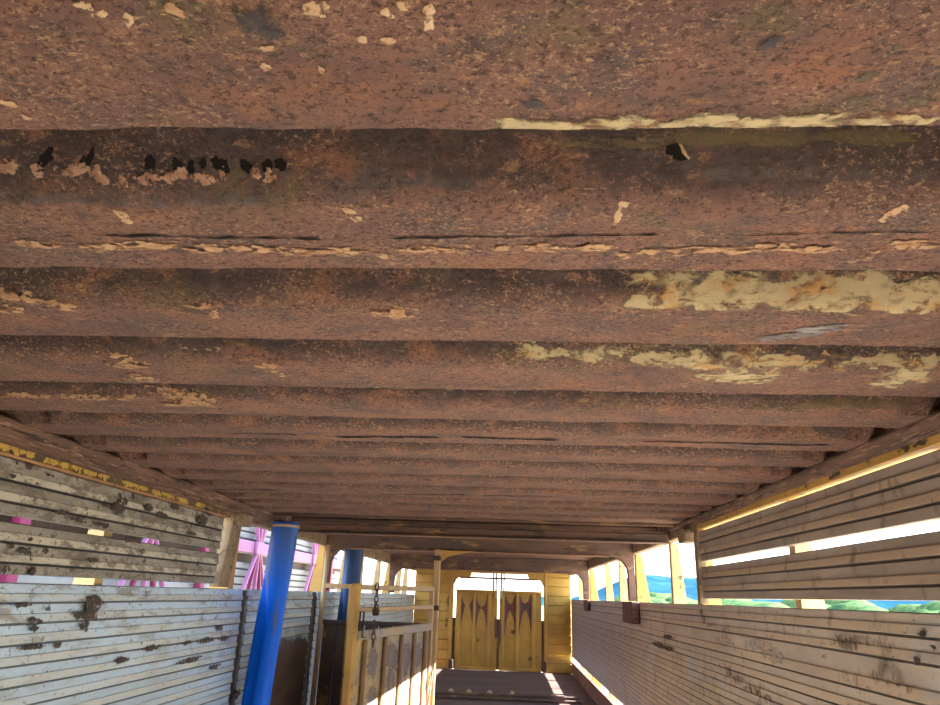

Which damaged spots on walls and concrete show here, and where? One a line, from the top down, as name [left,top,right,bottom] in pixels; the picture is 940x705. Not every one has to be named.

spalling [302,0,330,18]
peeling [495,112,940,130]
rust [0,157,230,188]
crack [100,233,321,241]
crack [390,232,660,240]
rust [14,239,839,260]
rust [0,287,79,314]
peeling [623,270,940,315]
water stain [755,324,850,342]
peeling [514,341,940,389]
rust [94,349,228,408]
crack [340,433,438,441]